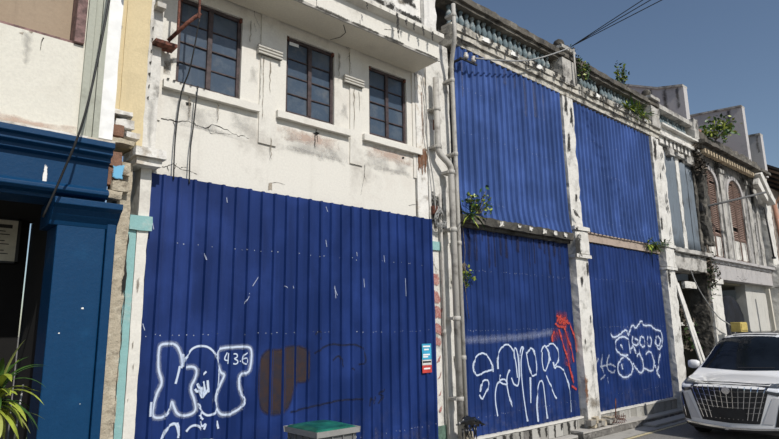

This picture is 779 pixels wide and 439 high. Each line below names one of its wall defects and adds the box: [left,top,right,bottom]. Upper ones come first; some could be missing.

crack [161,118,249,139]